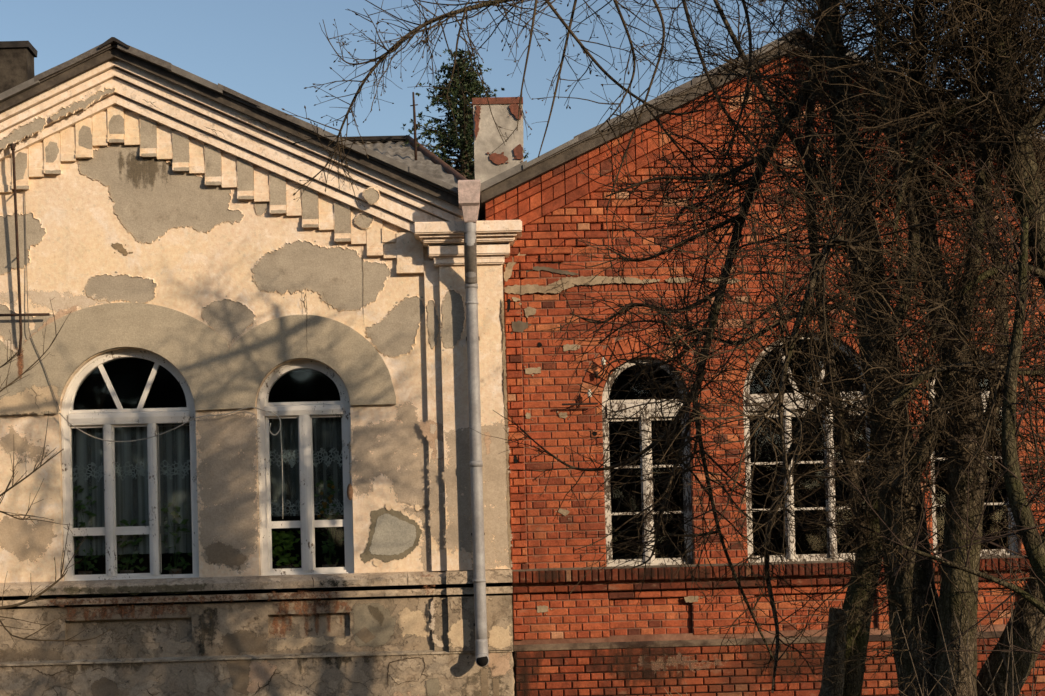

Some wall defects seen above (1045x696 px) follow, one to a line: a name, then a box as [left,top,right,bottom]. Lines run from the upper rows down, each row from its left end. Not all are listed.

flaking render [0,87,117,189]
flaking render [76,115,287,256]
peeling [471,105,481,140]
peeling [486,144,526,165]
peeling [509,103,527,120]
flaking render [0,210,47,276]
flaking render [250,186,392,312]
flaking render [0,271,158,353]
flaking render [201,296,256,346]
peeling [349,286,536,571]
peeling [195,410,261,574]
crack [252,657,433,696]